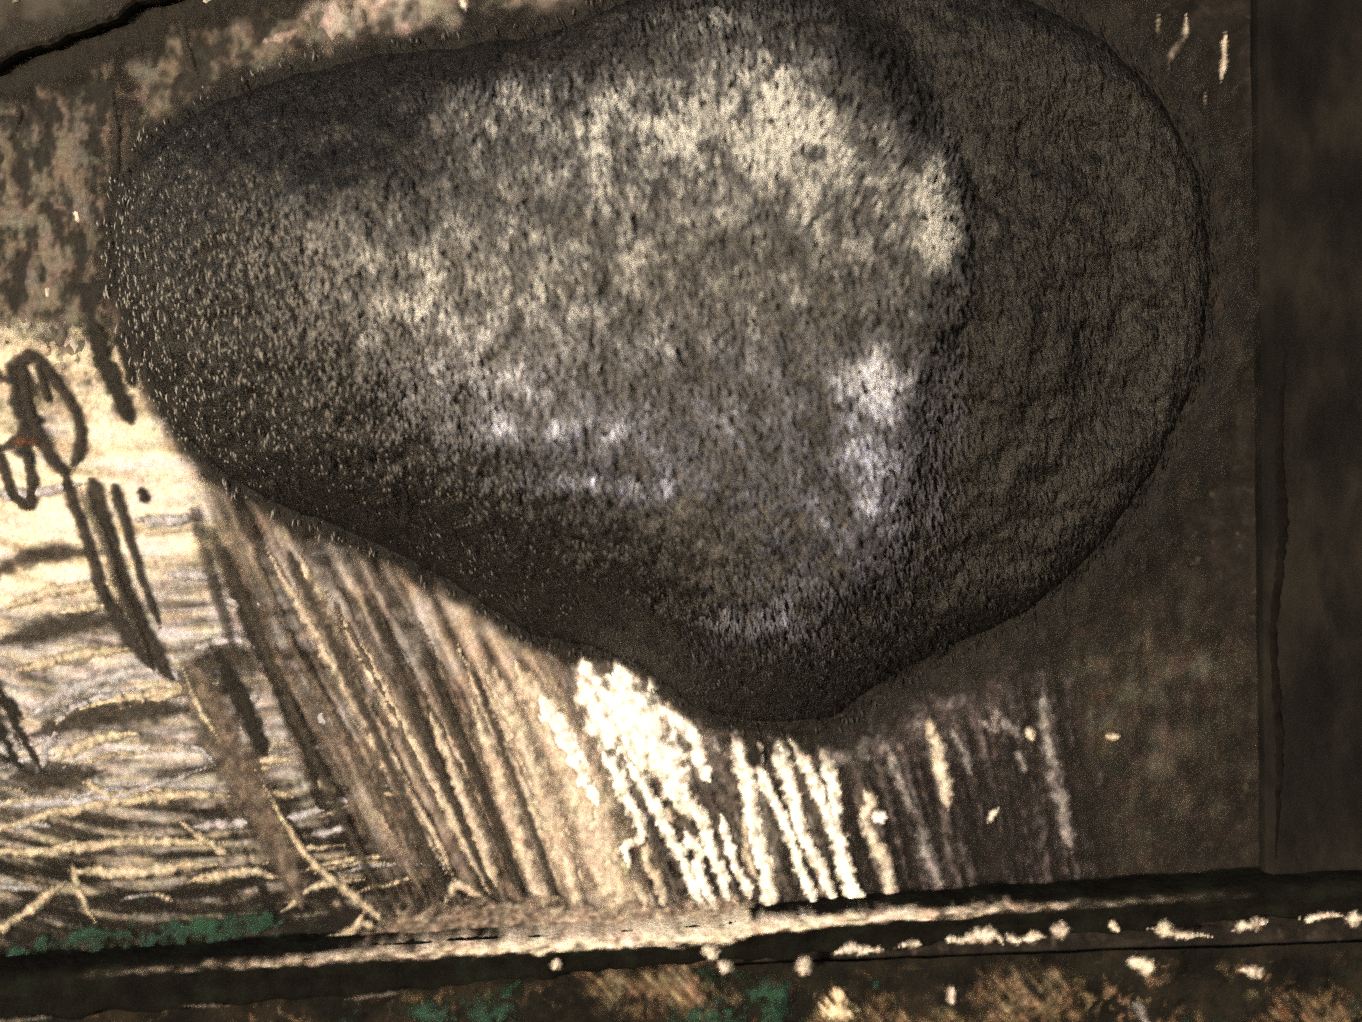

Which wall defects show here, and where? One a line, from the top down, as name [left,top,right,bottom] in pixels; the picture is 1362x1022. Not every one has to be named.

crack [0,0,308,221]